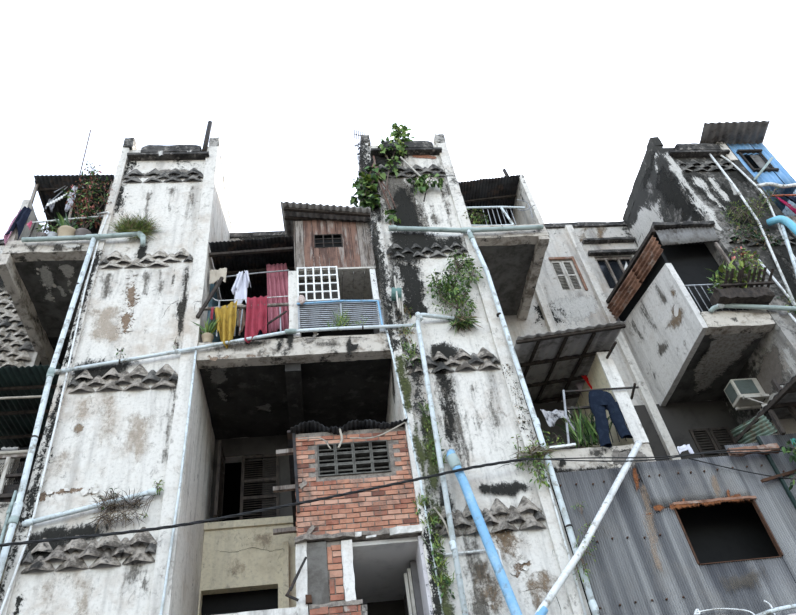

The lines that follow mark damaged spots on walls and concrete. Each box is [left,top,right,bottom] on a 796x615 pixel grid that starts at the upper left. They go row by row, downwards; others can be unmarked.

damp [629,152,758,248]
peeling [34,264,77,302]
damp [355,139,465,450]
damp [767,251,796,306]
damp [0,249,138,605]
damp [419,480,453,615]
corrosion [633,468,742,571]